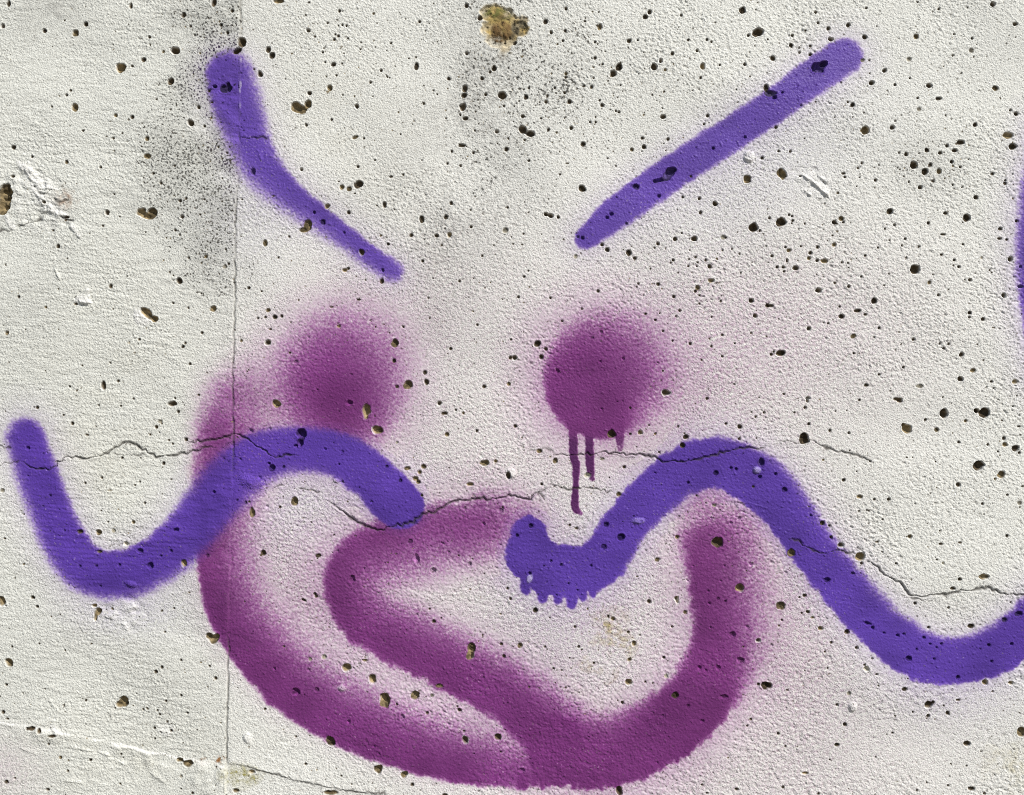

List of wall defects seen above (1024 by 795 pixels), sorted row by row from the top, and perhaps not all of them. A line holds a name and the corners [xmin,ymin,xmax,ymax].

crack [0,433,874,533]
crack [788,537,1024,603]